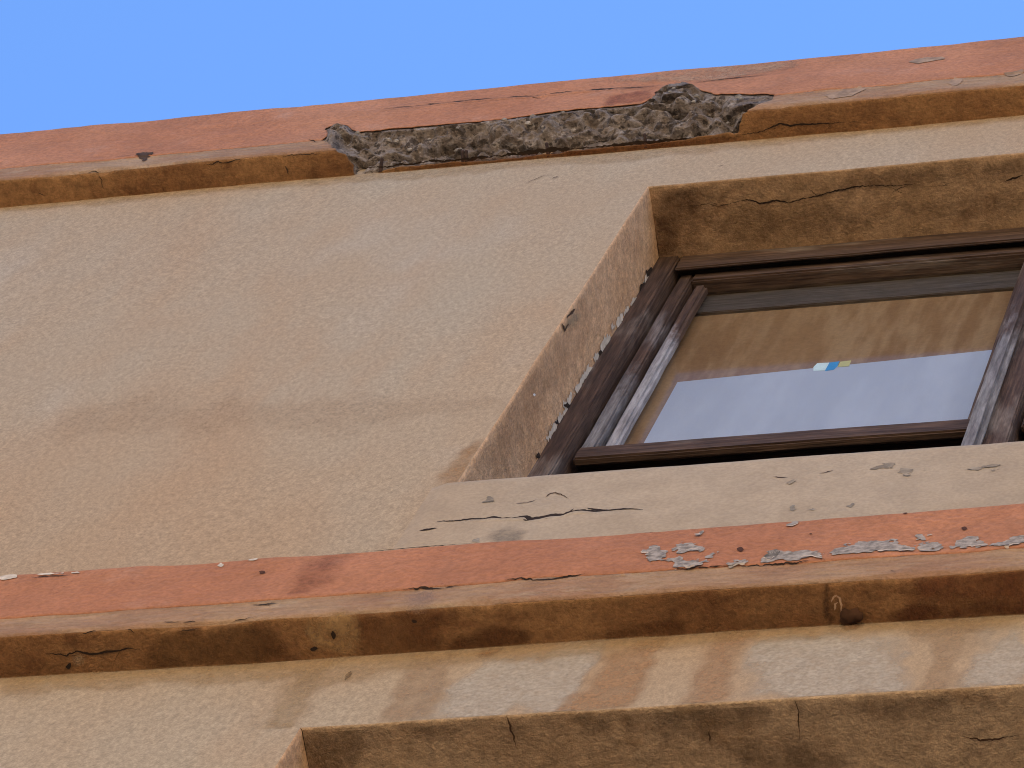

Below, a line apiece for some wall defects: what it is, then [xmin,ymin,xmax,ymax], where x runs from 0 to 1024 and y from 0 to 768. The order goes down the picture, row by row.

spalling [285,82,774,174]
crack [683,182,959,207]
peeling [870,462,913,476]
crack [419,492,643,531]
crack [507,573,581,581]
peeling [641,530,719,570]
crack [677,559,825,570]
peeling [761,526,1024,562]
damp [862,571,1024,628]
damp [442,622,687,717]
damp [748,600,905,697]
damp [965,638,1024,685]